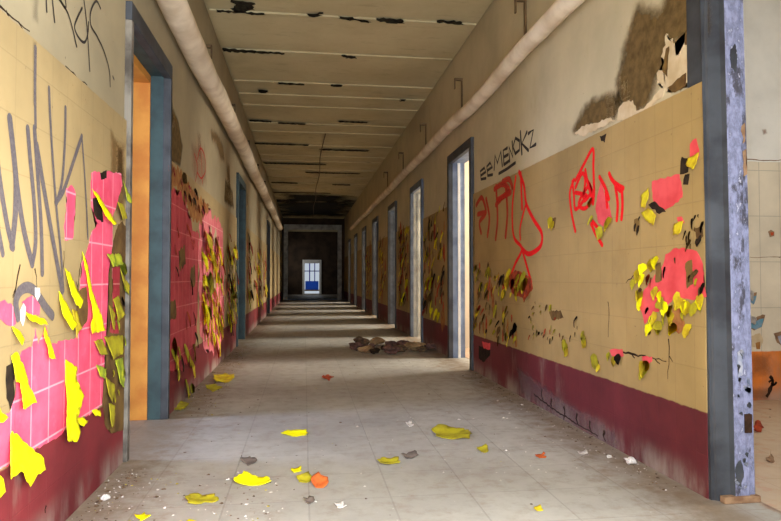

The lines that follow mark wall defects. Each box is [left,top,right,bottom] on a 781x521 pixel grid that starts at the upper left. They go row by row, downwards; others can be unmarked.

peeling [217,0,264,15]
peeling [339,16,405,24]
spalling [575,27,687,143]
peeling [634,139,699,235]
peeling [0,170,132,498]
peeling [168,165,268,399]
peeling [473,263,533,362]
peeling [528,305,586,357]
peeling [590,349,624,373]
peeling [638,356,652,380]
peeling [630,214,707,338]